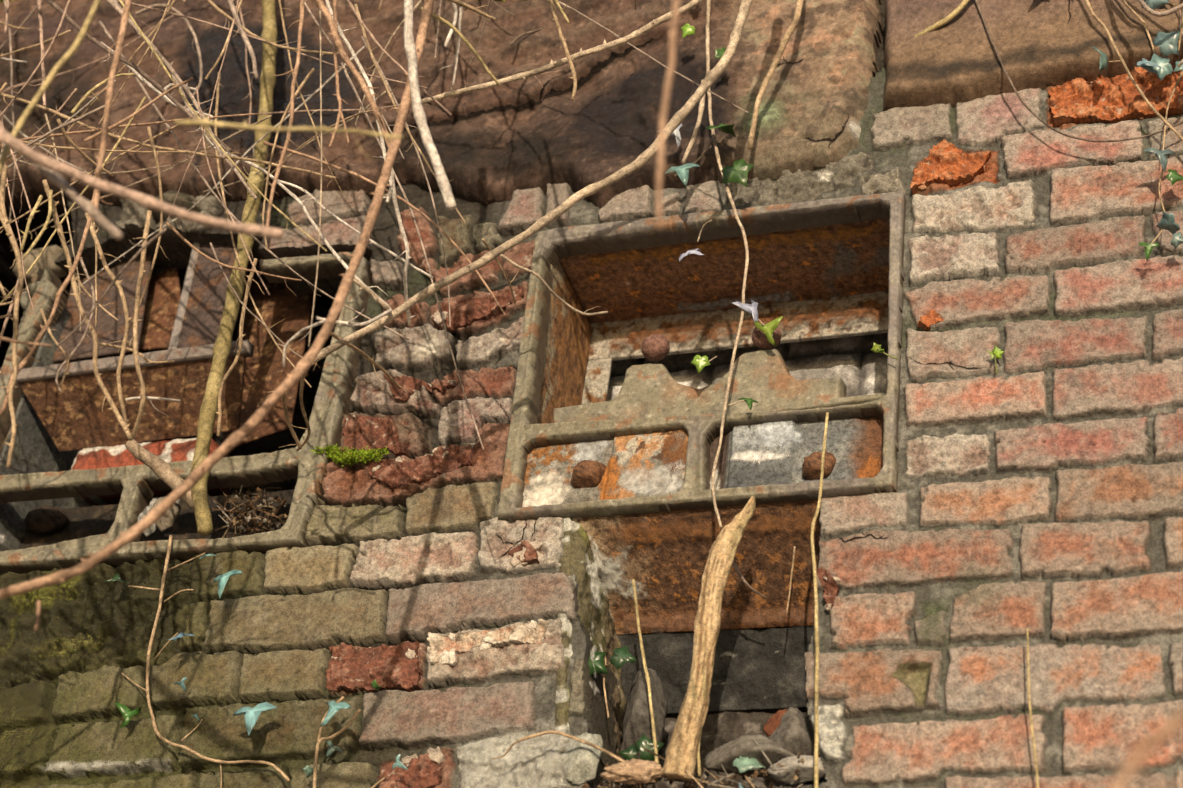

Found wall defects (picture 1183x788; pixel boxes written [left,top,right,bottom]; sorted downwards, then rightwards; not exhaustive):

spalling [1048,66,1183,127]
spalling [910,139,992,195]
rust [591,224,877,266]
rust [610,298,888,350]
spalling [383,373,457,406]
spalling [340,414,475,490]
rust [624,614,696,631]
rust [720,607,815,626]
leakage [0,559,197,786]
spalling [325,619,547,696]
spalling [377,746,445,788]